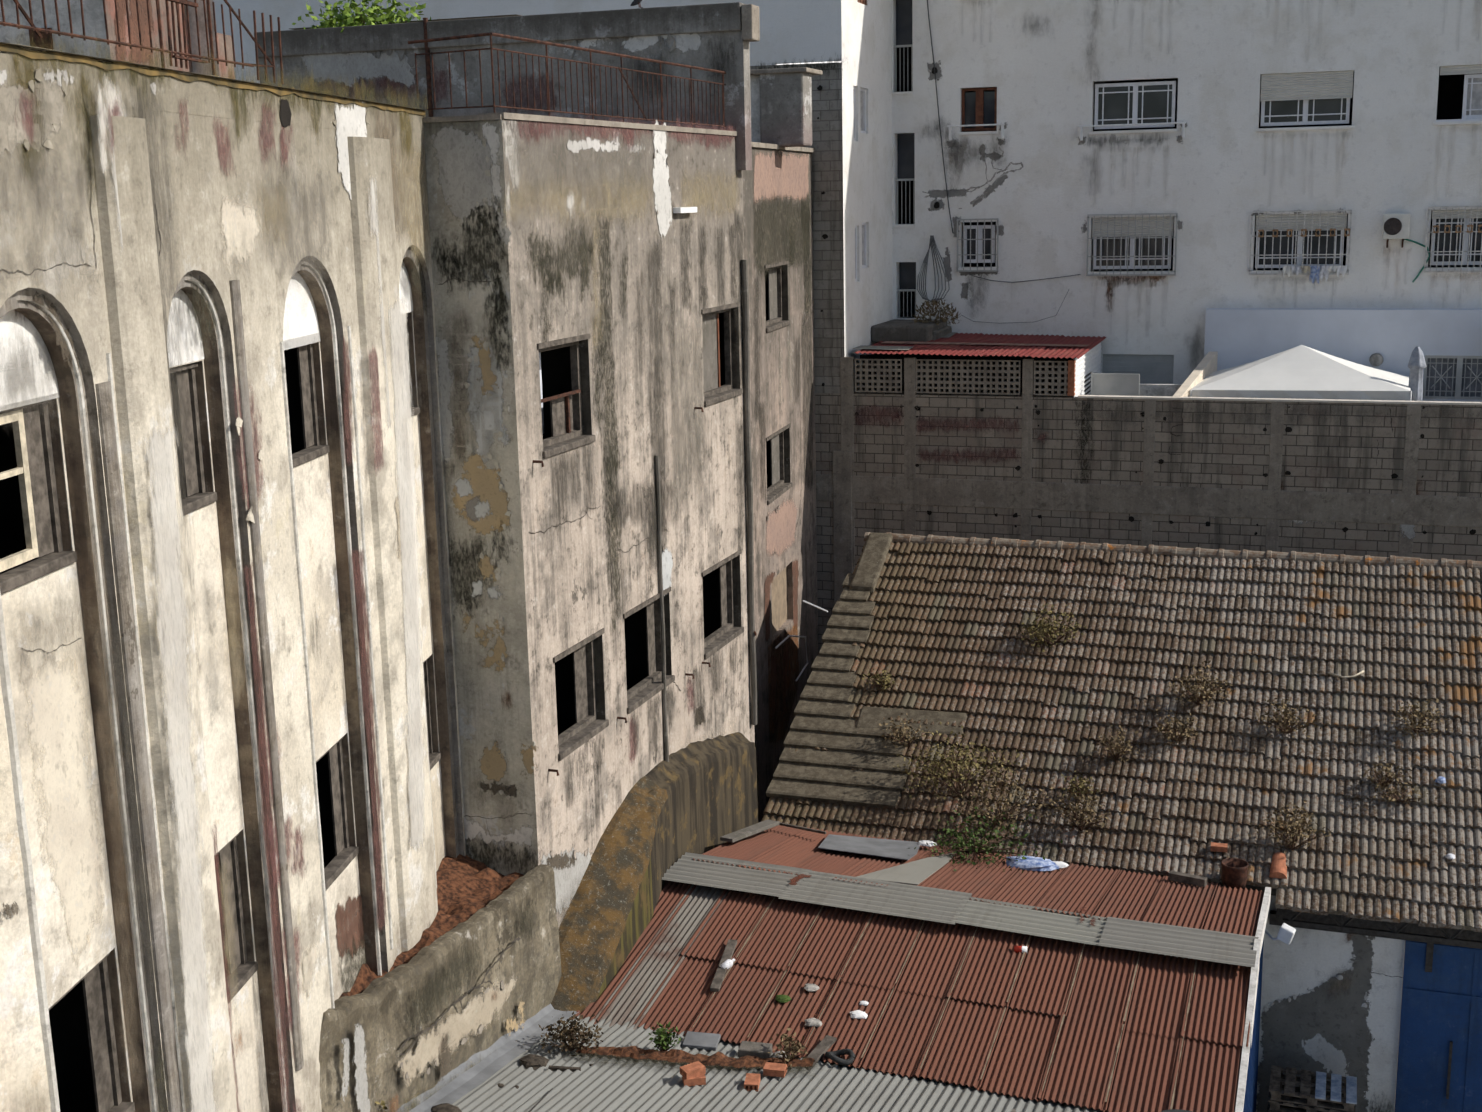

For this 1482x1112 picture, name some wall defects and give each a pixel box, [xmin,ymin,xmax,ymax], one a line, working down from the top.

peeling [567,131,645,155]
peeling [436,335,511,672]
water stain [307,68,737,848]
water stain [739,193,813,548]
water stain [352,549,386,930]